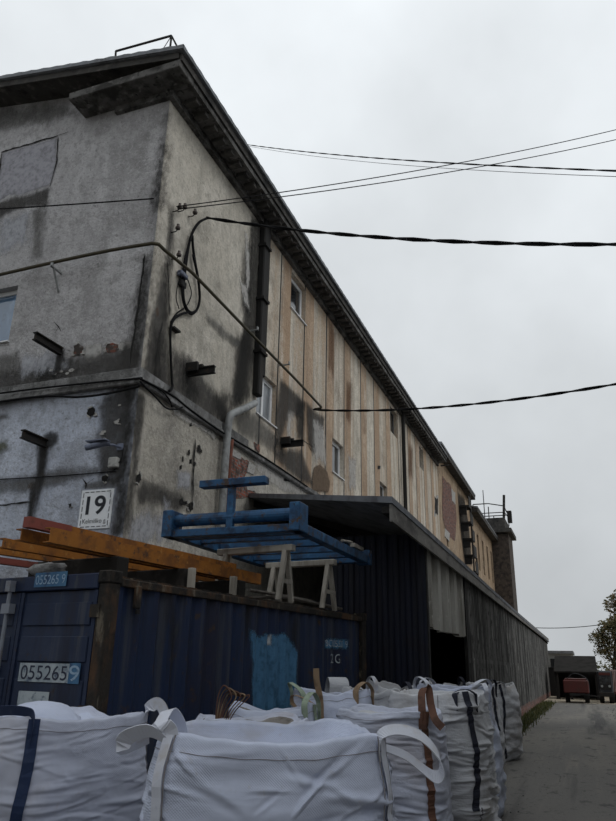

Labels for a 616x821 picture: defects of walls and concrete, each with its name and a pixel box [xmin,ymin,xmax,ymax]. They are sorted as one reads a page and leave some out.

leakage [0,189,48,254]
peeling [71,341,134,361]
leakage [0,213,250,422]
leakage [238,381,324,484]